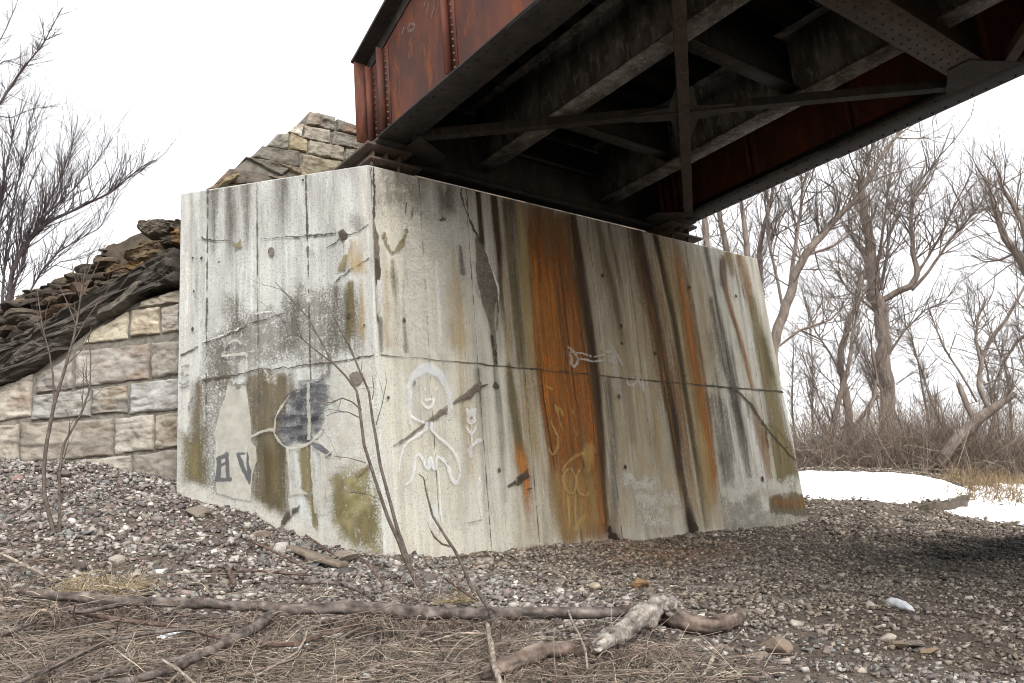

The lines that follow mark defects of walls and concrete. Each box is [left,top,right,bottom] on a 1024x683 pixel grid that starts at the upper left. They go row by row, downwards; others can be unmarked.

water stain [177,359,352,550]
crack [440,188,499,330]
corrosion [501,199,716,543]
water stain [622,229,807,528]